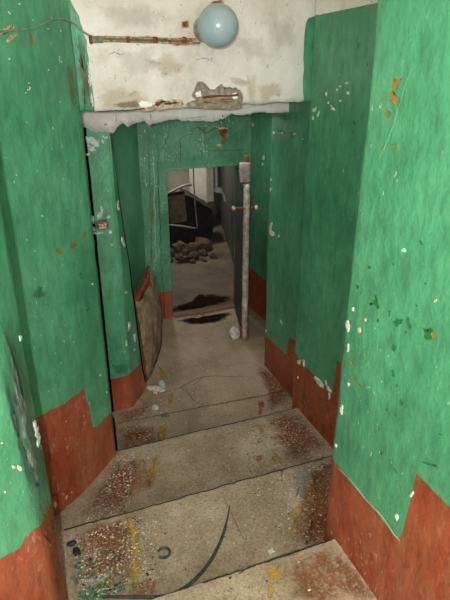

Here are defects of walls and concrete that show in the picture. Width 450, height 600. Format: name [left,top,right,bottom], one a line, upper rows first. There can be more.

spalling [138,81,243,111]
peeling [389,77,401,105]
flaking render [71,205,112,250]
crack [84,108,291,451]
peeling [423,328,437,340]